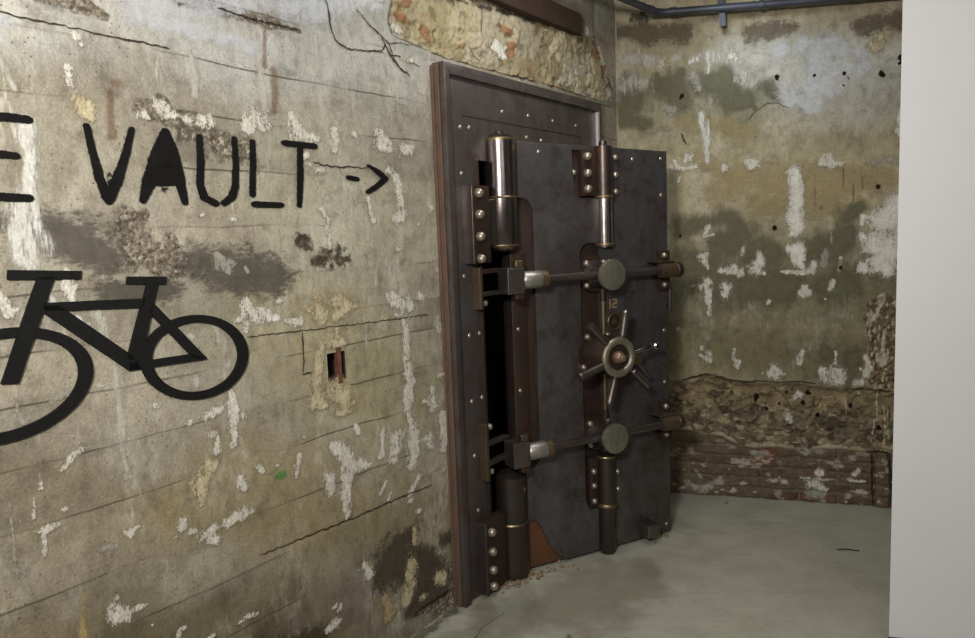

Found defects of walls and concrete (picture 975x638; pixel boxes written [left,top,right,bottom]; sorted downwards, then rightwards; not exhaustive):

crack [0,11,169,49]
crack [218,8,299,30]
crack [325,0,421,77]
flaking render [376,0,611,102]
peeling [692,247,766,318]
peeling [780,163,843,300]
peeling [856,192,899,280]
peeling [232,289,447,520]
spalling [669,293,896,508]
peeling [324,602,344,635]
leakage [372,526,454,620]
peeling [378,526,454,625]